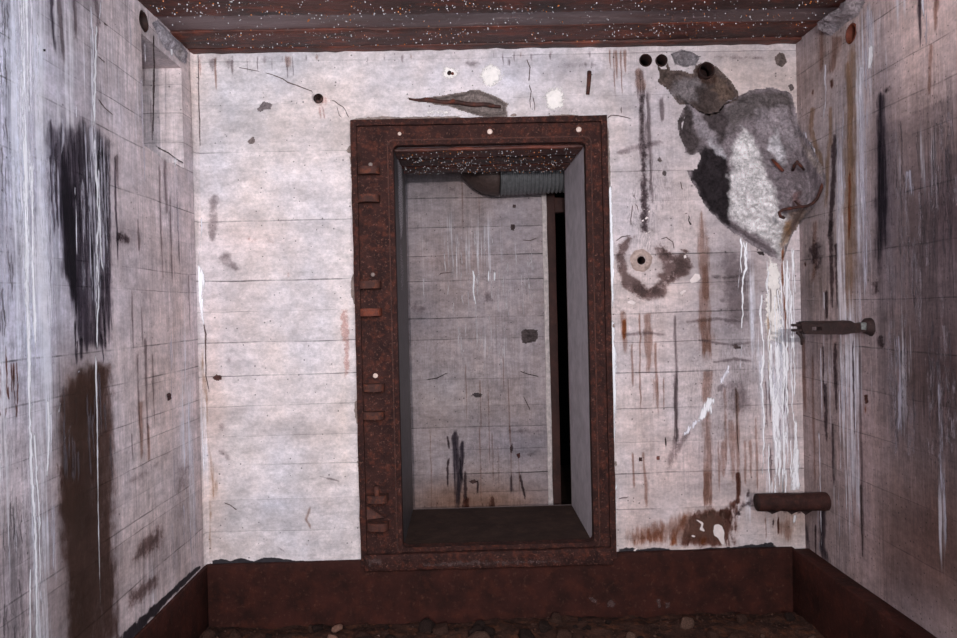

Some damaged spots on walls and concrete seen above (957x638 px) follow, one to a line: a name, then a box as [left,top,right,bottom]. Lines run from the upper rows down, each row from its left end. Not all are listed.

spalling [817,0,865,36]
spalling [408,90,509,117]
spalling [658,49,826,260]
water stain [0,0,129,638]
water stain [616,235,690,297]
water stain [738,238,748,328]
water stain [857,0,957,455]
water stain [759,249,800,493]
rust [647,473,741,546]